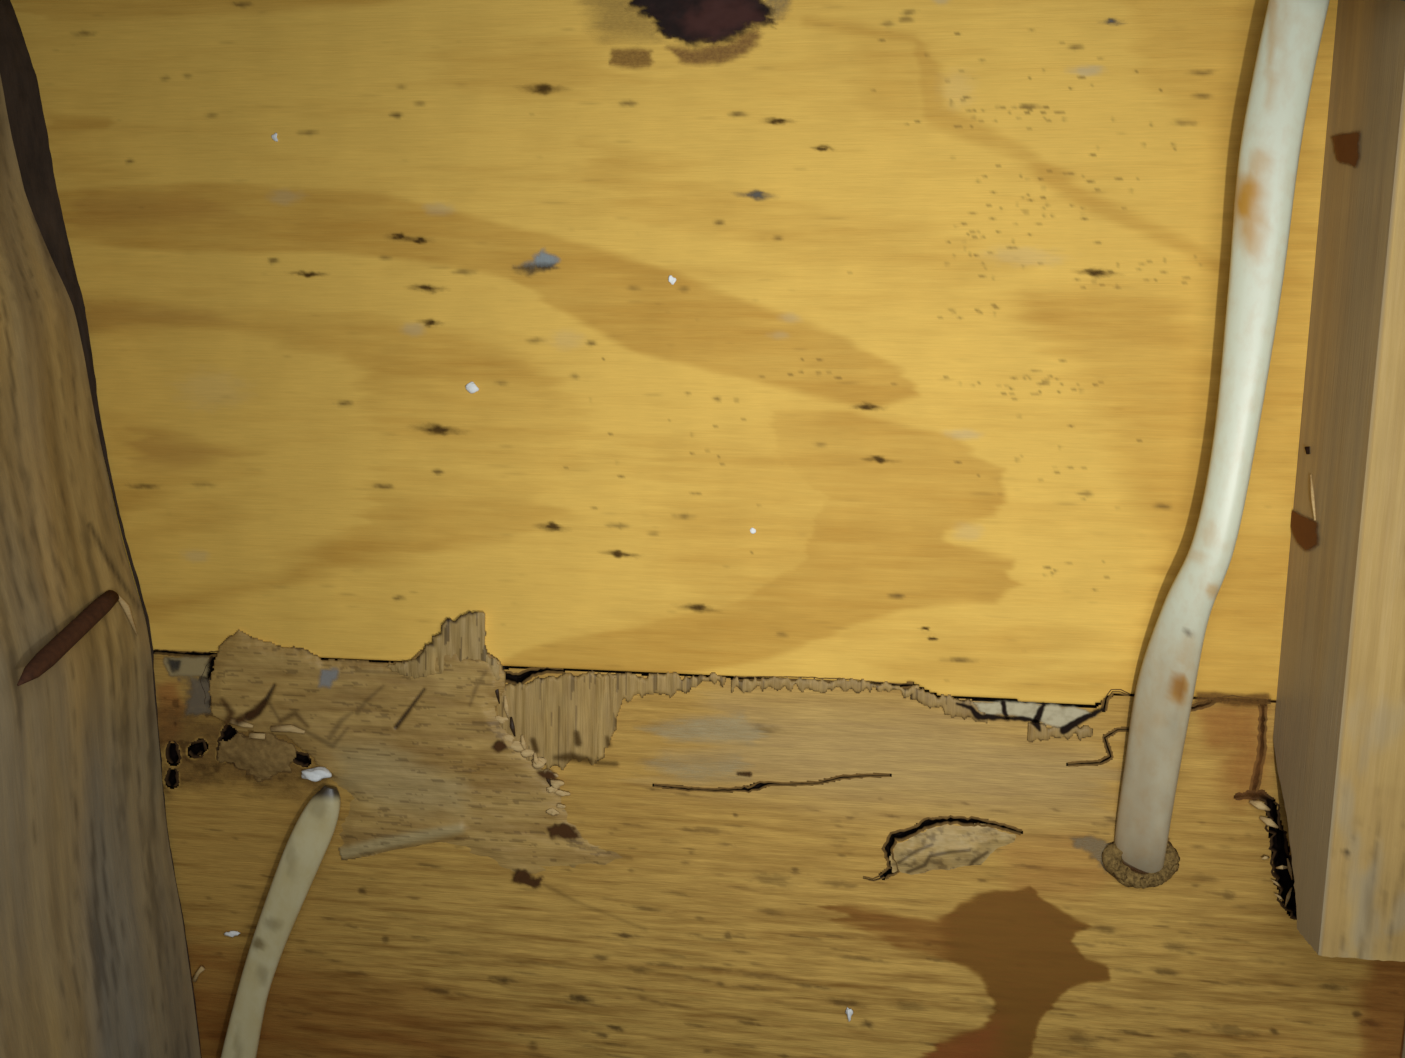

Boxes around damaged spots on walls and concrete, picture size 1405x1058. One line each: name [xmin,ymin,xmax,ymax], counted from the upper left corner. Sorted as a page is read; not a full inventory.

leakage [612,51,649,65]
leakage [630,0,787,63]
leakage [523,252,558,272]
crack [154,649,219,705]
crack [505,667,564,685]
crack [734,676,914,689]
spalling [495,670,726,816]
crack [1068,689,1130,767]
crack [1191,695,1275,805]
crack [654,773,890,793]
leakage [931,890,1108,1058]